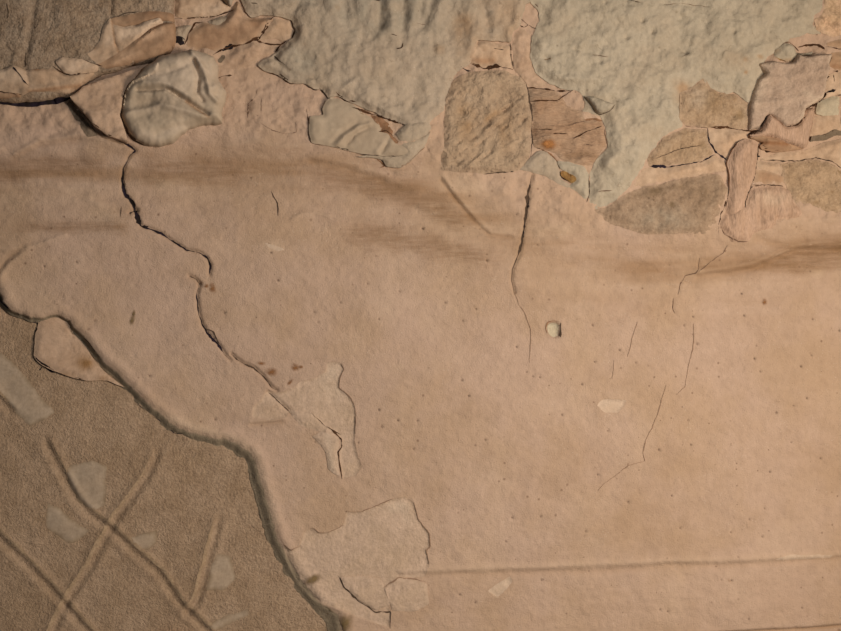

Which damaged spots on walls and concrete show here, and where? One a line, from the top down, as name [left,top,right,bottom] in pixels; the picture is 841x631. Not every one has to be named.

spalling [67,101,97,137]
spalling [371,115,398,143]
spalling [585,96,614,115]
crack [94,124,289,411]
crack [487,171,532,358]
spalling [0,305,431,631]
crack [600,324,694,488]